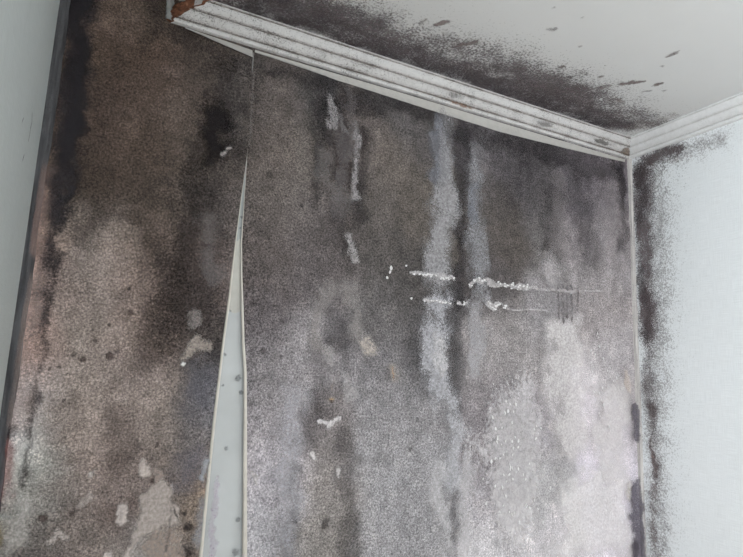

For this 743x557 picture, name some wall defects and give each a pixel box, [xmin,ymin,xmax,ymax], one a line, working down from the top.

water stain [43,0,98,284]
water stain [199,105,233,166]
water stain [35,291,61,370]
water stain [181,310,212,366]
water stain [327,87,684,557]
water stain [25,391,41,438]